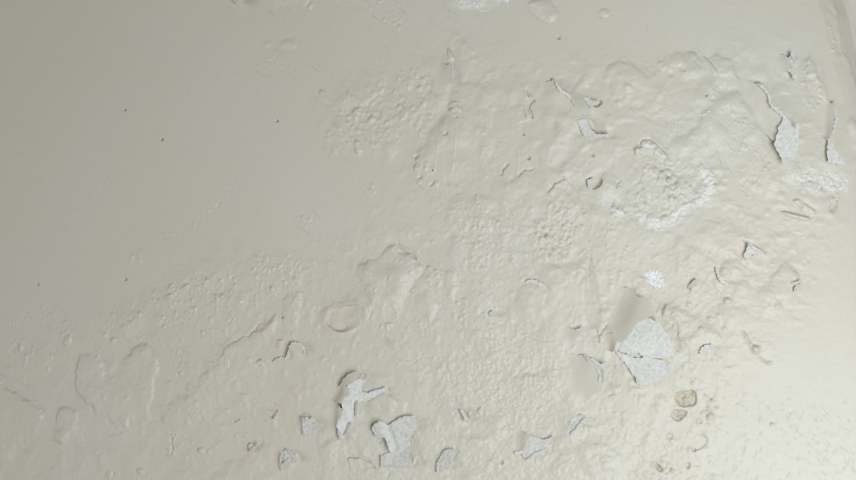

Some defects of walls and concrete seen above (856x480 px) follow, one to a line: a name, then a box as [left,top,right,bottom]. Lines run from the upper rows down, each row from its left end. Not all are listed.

peeling [734,76,851,213]
peeling [597,287,682,386]
peeling [300,371,386,441]
peeling [372,415,417,469]